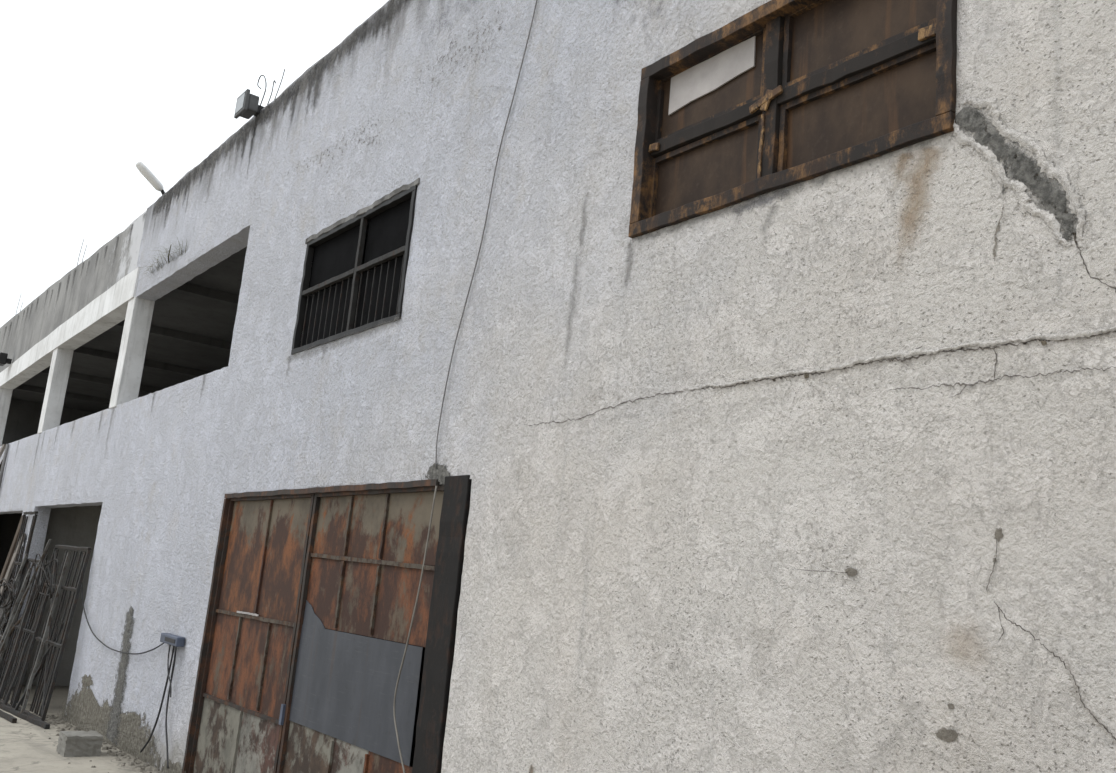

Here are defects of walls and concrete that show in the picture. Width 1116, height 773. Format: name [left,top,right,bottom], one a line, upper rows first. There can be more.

damp [5,0,407,331]
spalling [953,97,1086,262]
crack [1076,243,1116,292]
crack [524,325,1116,426]
crack [986,527,1116,740]